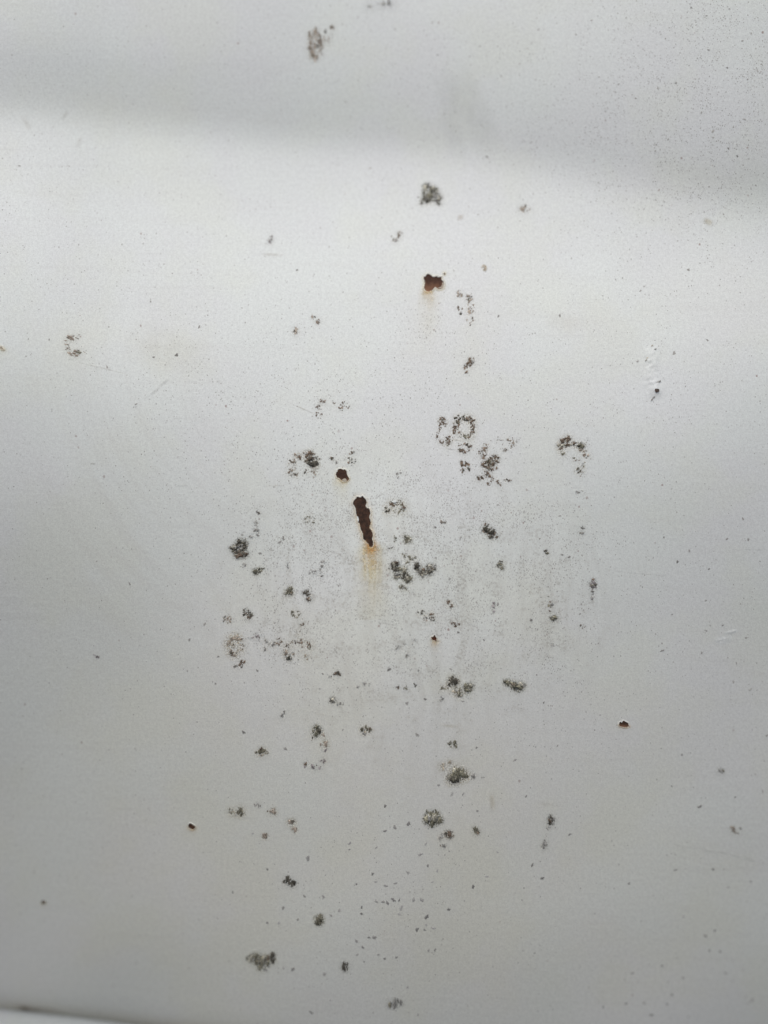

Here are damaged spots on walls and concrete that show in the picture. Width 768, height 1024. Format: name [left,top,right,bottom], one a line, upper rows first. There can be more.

rust [351,494,376,575]